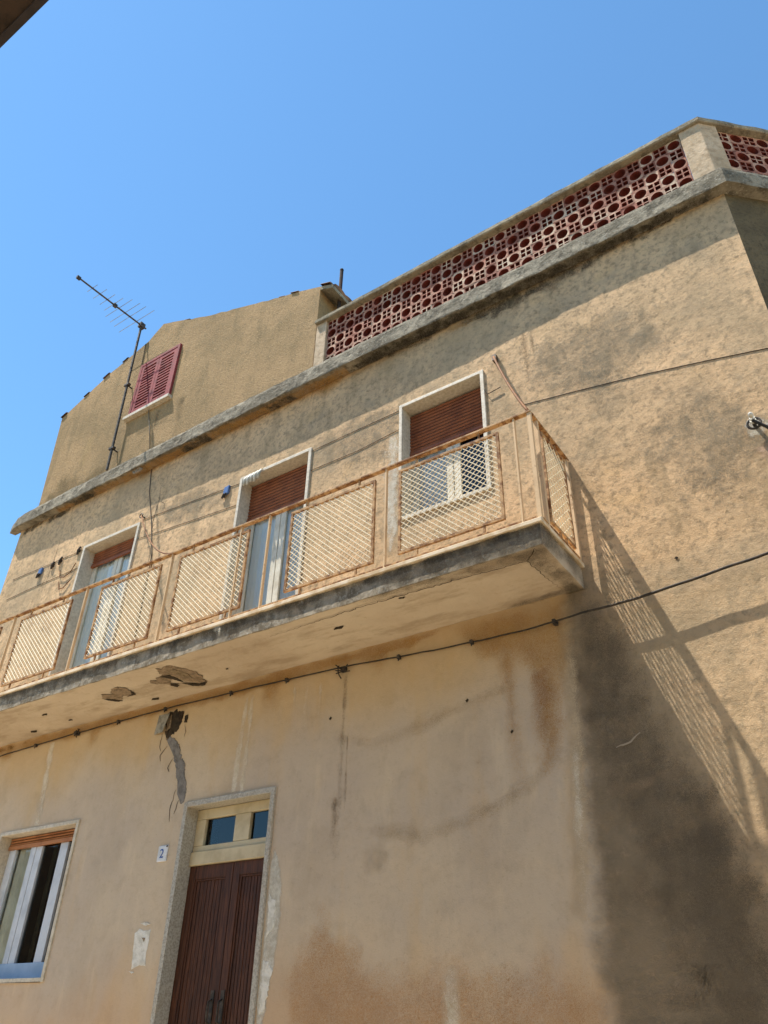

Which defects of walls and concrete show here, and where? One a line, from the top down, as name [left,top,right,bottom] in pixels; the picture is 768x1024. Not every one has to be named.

spalling [101,687,136,702]
spalling [150,666,208,687]
spalling [154,709,188,751]
water stain [0,522,768,1024]